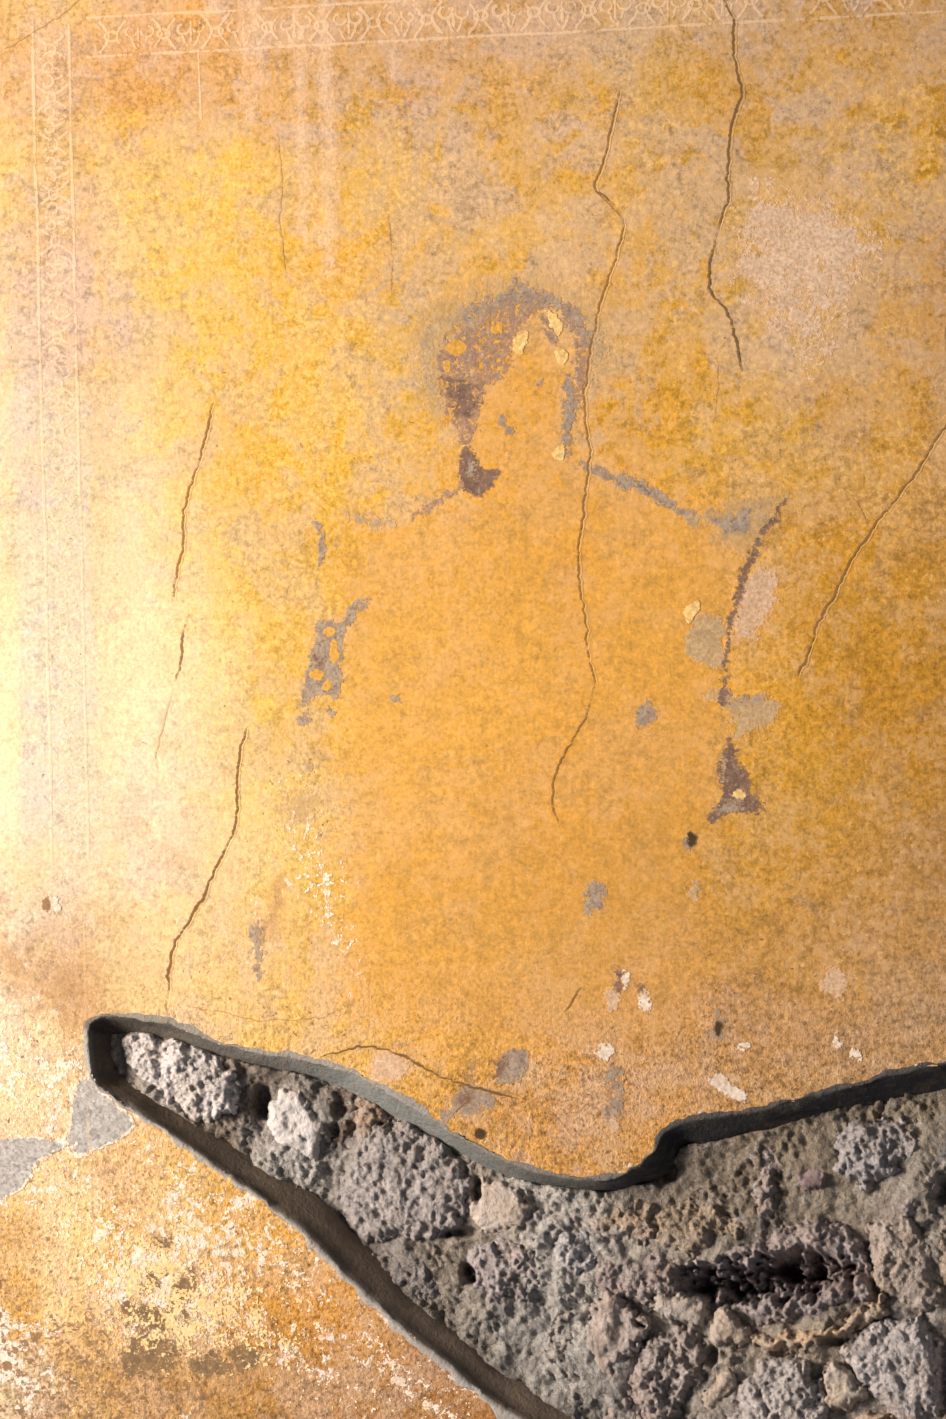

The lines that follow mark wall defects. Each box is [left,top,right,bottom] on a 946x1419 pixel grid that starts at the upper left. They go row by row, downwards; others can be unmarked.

crack [707,0,743,421]
crack [154,403,212,771]
crack [551,91,624,825]
crack [796,423,946,679]
spalling [0,1009,946,1419]